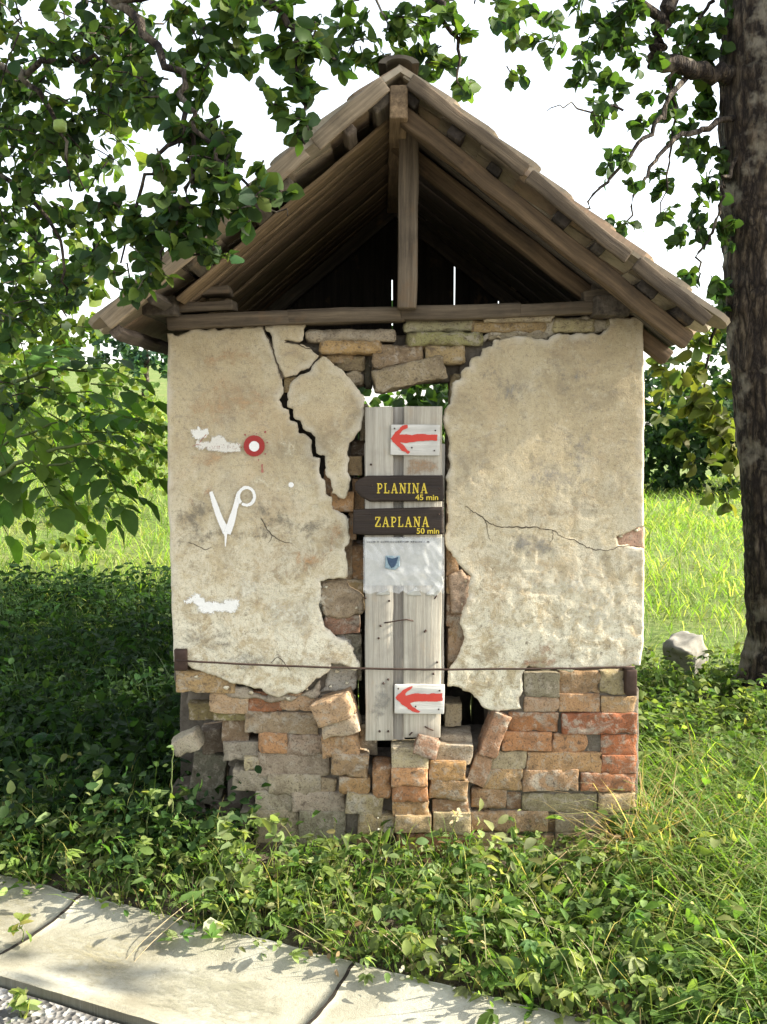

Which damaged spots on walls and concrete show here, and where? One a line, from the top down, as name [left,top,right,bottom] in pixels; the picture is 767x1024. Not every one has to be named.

crack [263,327,326,478]
crack [466,506,638,551]
spalling [616,526,645,549]
spalling [320,578,364,619]
spalling [448,569,470,614]
spalling [223,663,358,703]